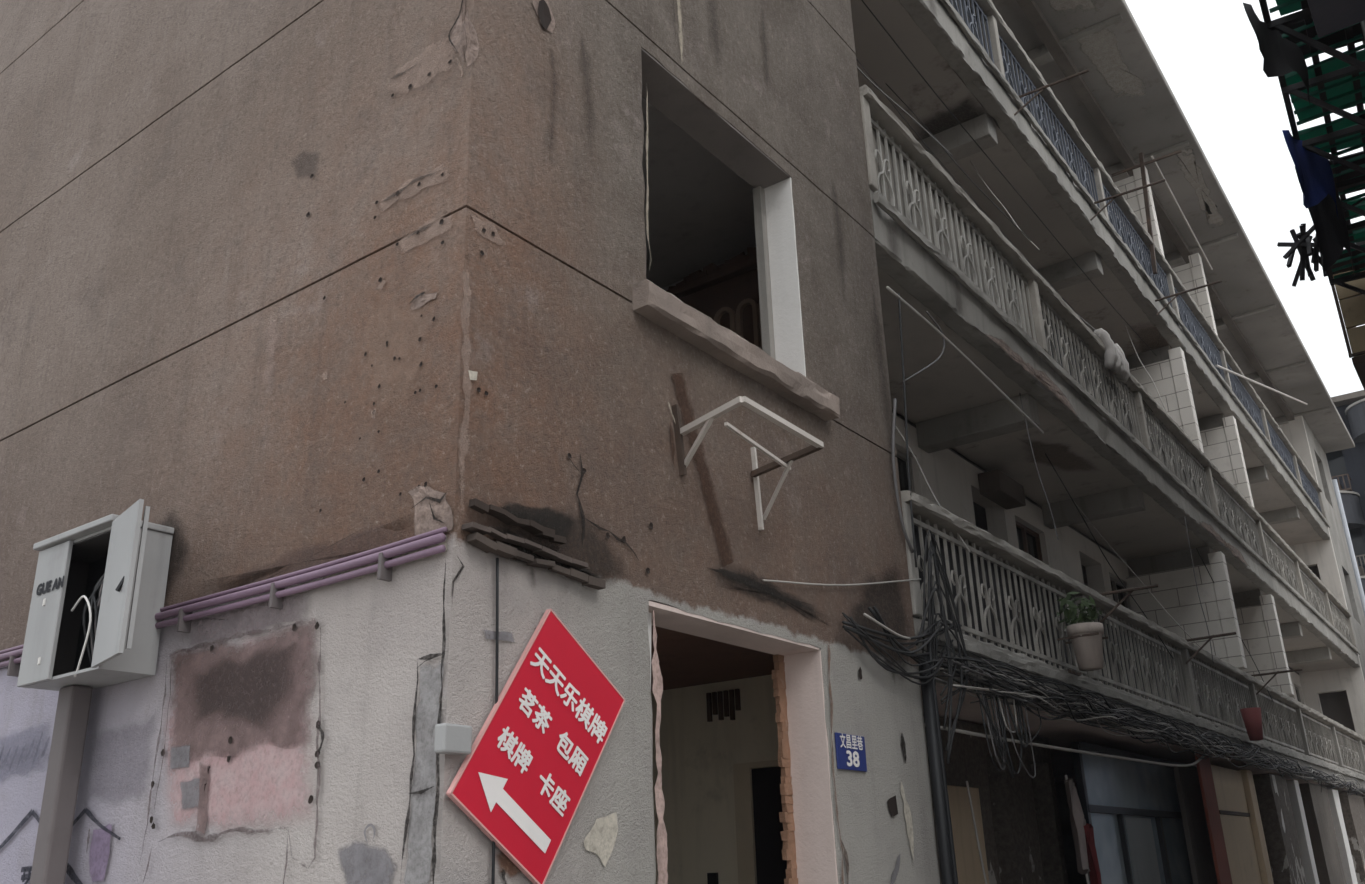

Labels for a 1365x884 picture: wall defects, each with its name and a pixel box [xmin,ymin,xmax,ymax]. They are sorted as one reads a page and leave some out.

spalling [448,0,479,66]
spalling [373,173,443,219]
peeling [140,619,325,884]
spalling [401,653,444,884]